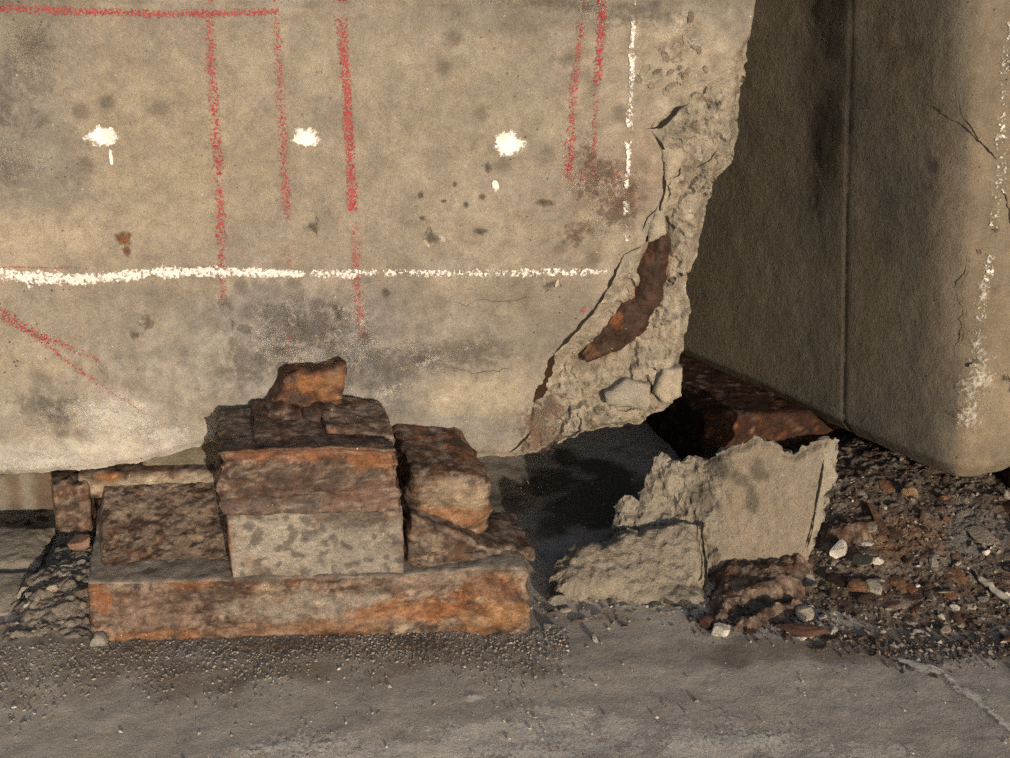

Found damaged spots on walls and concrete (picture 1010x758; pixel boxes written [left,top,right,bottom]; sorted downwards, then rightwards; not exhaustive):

crack [959,103,997,159]
rust [579,155,637,225]
spalling [516,32,751,456]